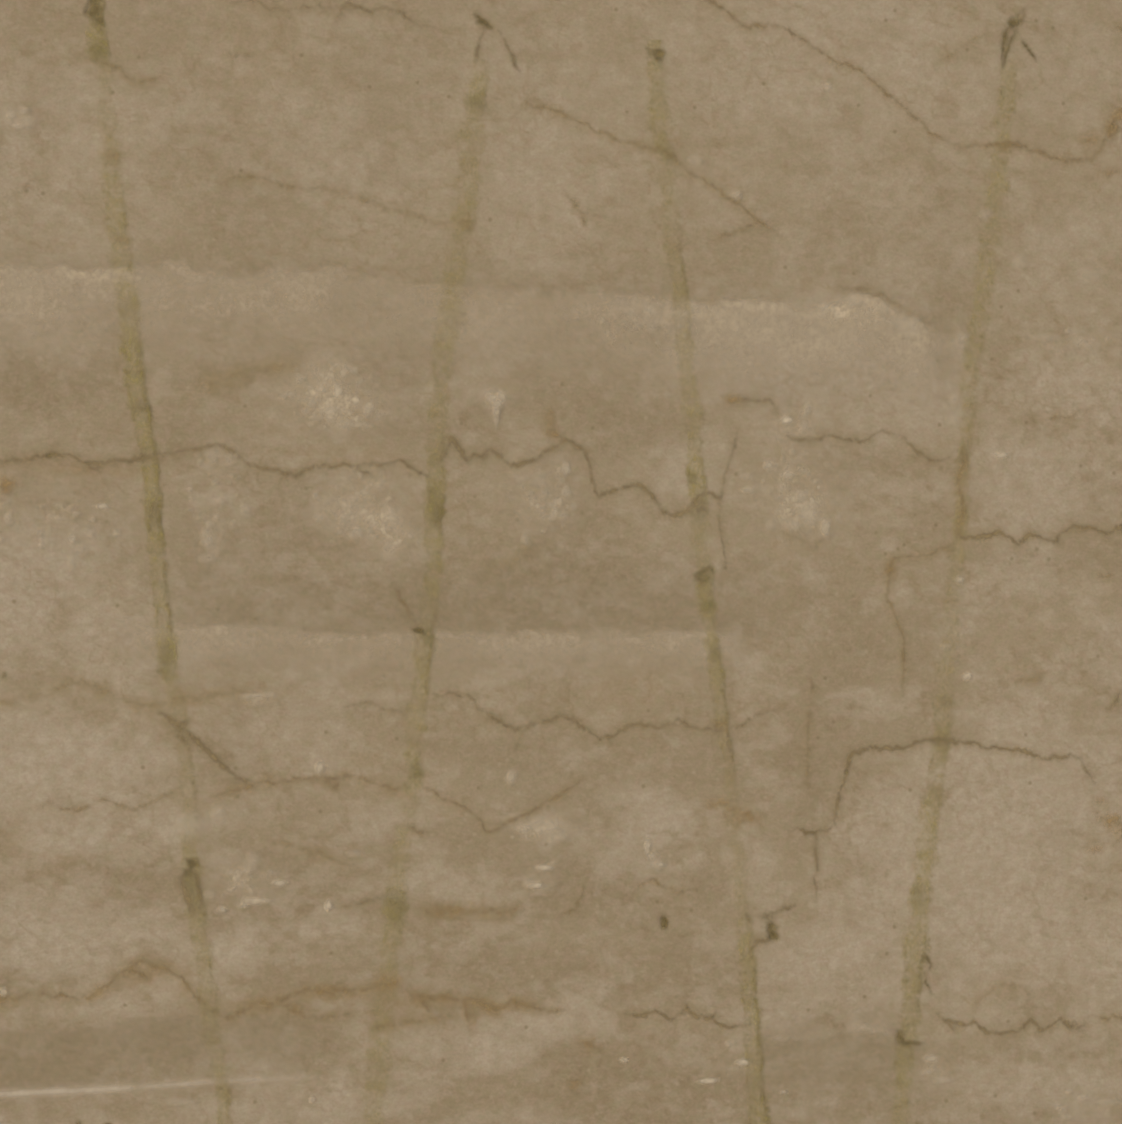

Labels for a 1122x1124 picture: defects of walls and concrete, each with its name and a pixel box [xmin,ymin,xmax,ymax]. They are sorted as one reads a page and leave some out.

water stain [0,266,141,327]
water stain [573,292,936,373]
crack [444,436,582,467]
crack [591,477,716,518]
crack [957,461,1122,543]
crack [150,705,273,791]
crack [835,739,1088,809]